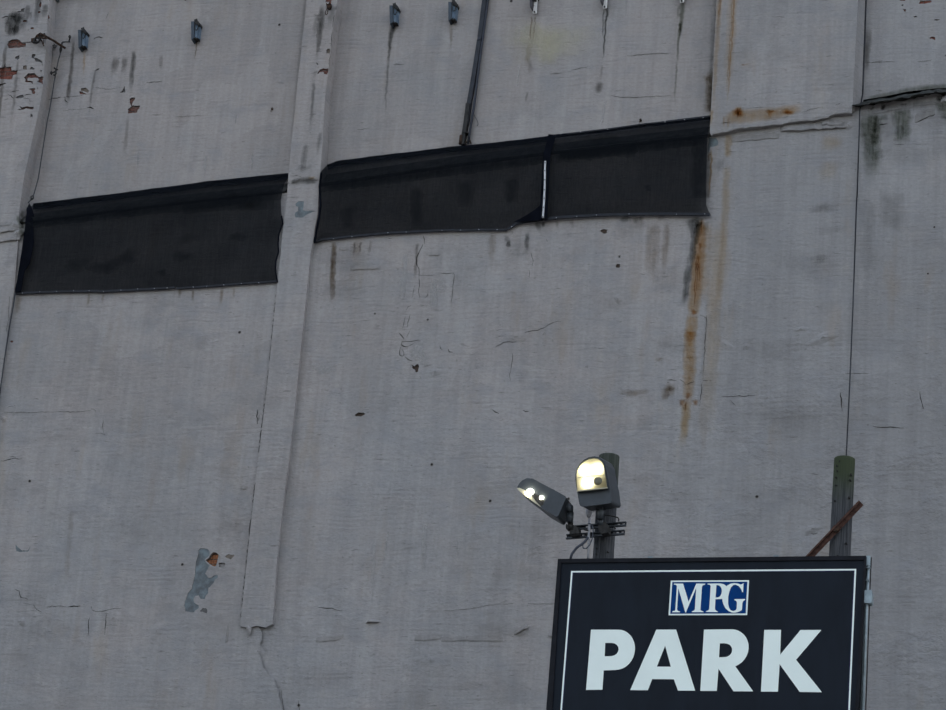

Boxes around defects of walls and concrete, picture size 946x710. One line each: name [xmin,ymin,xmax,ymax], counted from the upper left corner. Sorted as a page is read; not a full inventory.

spalling [0,39,43,118]
crack [399,236,454,366]
peeling [184,548,234,613]